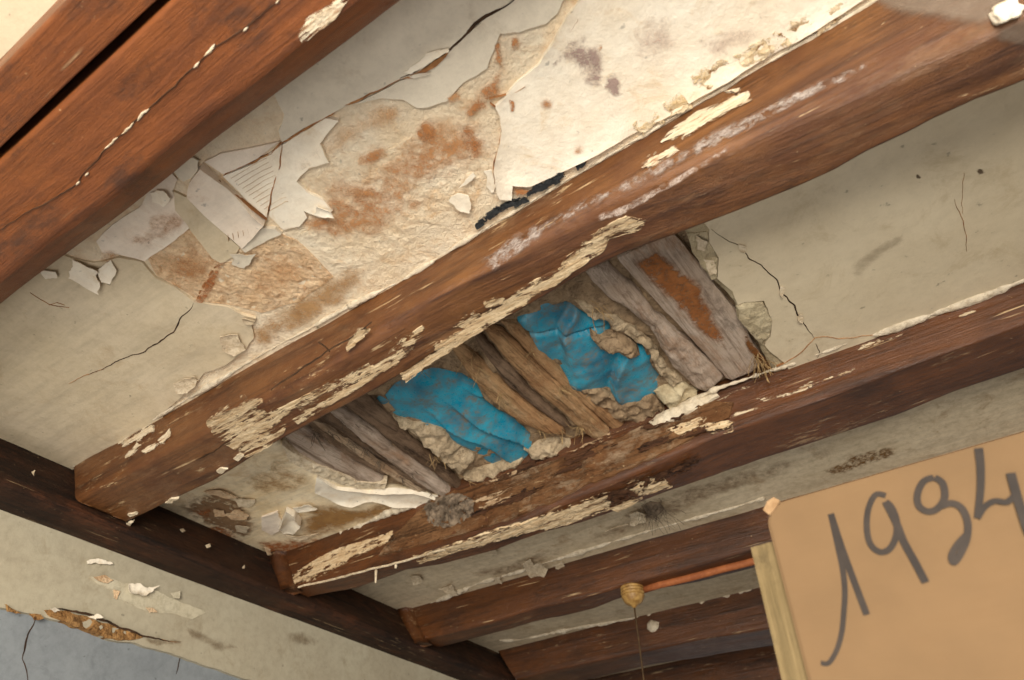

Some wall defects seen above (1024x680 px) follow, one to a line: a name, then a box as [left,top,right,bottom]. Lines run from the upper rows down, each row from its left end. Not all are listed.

crack [0,0,279,230]
damp [566,47,619,95]
peeling [0,0,863,470]
crack [69,262,219,384]
peeling [165,189,658,555]
crack [711,229,871,367]
crack [22,621,35,680]
flaking render [5,604,142,641]
peeling [87,558,207,619]
peeling [293,477,673,588]